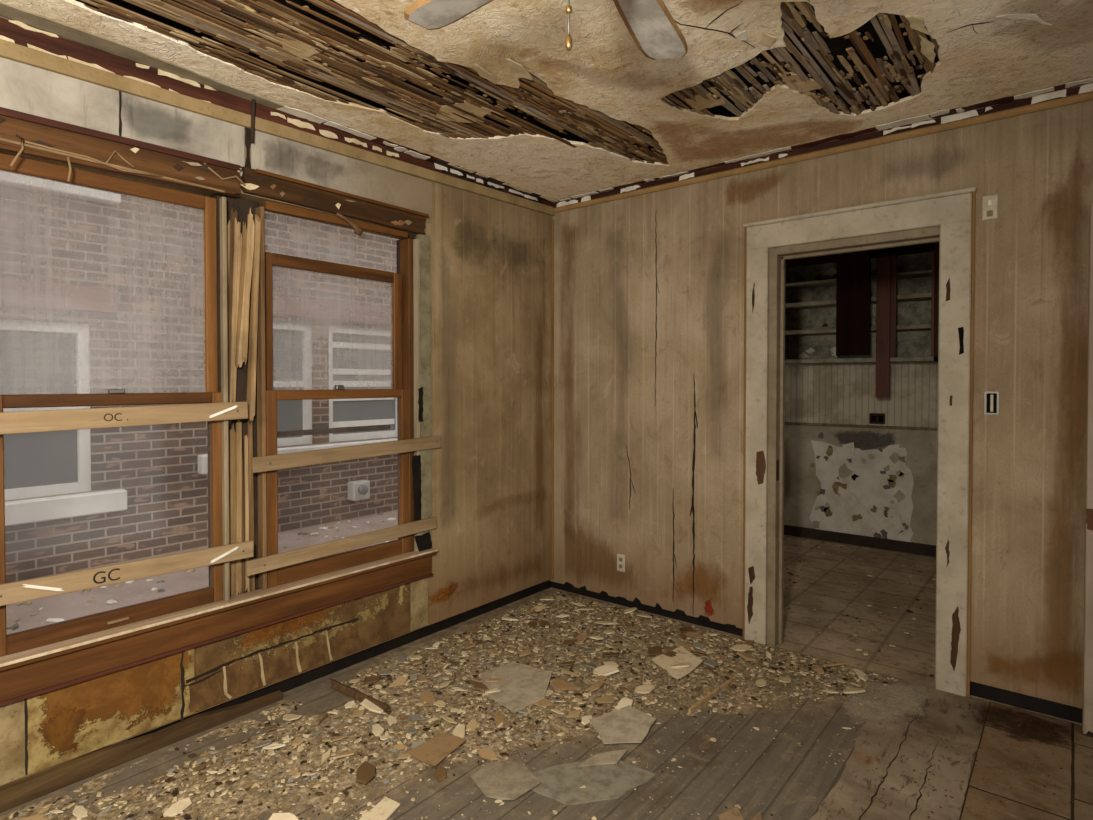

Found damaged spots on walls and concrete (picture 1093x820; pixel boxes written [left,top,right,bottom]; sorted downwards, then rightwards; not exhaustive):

peeling [8,20,59,38]
peeling [0,35,217,103]
flaking render [81,0,694,207]
flaking render [661,2,940,117]
peeling [876,107,993,135]
peeling [1014,78,1093,104]
peeling [724,146,791,166]
peeling [809,432,914,542]
peeling [950,606,961,671]